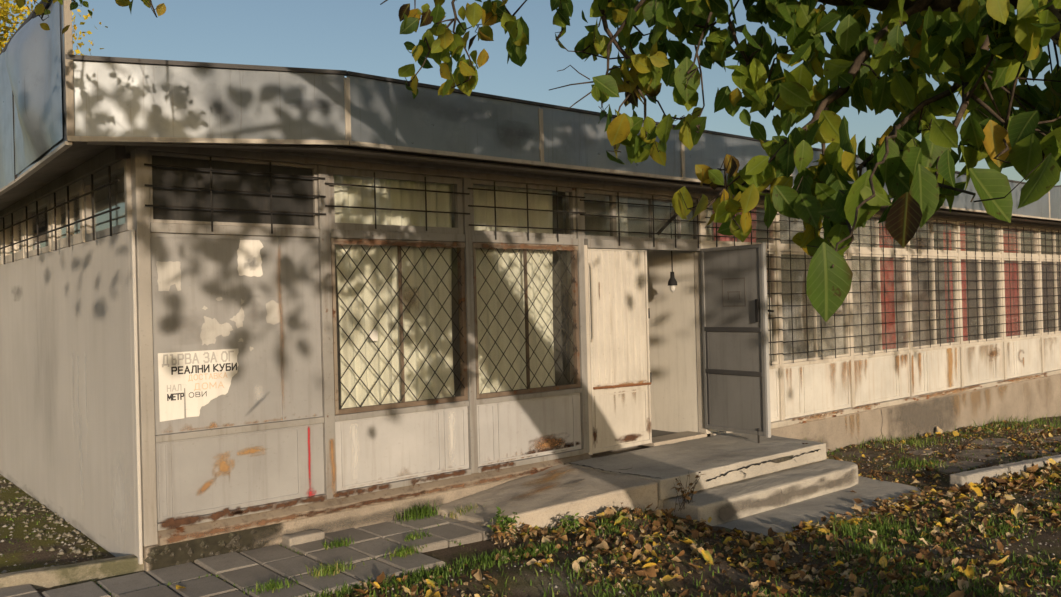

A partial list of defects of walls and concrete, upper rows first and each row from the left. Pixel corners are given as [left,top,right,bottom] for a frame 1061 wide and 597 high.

rust [832,360,867,378]
rust [896,353,921,388]
rust [947,343,1009,387]
rust [619,422,651,442]
crack [706,449,821,482]
rust [161,436,580,543]